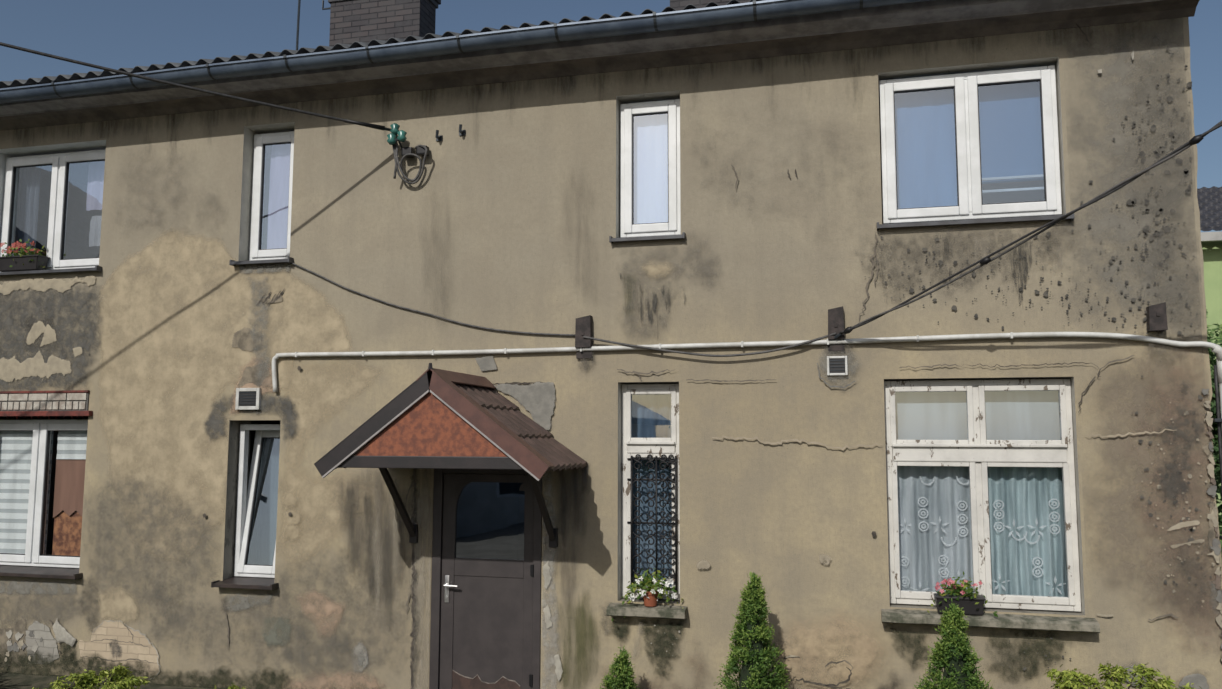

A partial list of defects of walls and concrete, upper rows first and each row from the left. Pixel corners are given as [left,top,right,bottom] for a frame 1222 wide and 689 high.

leakage [861,48,1199,350]
peeling [0,275,98,391]
leakage [620,274,686,334]
crack [899,355,1176,438]
crack [712,436,882,450]
spalling [1133,386,1222,662]
leakage [348,475,417,670]
flaking render [0,619,160,680]
crack [784,655,853,689]